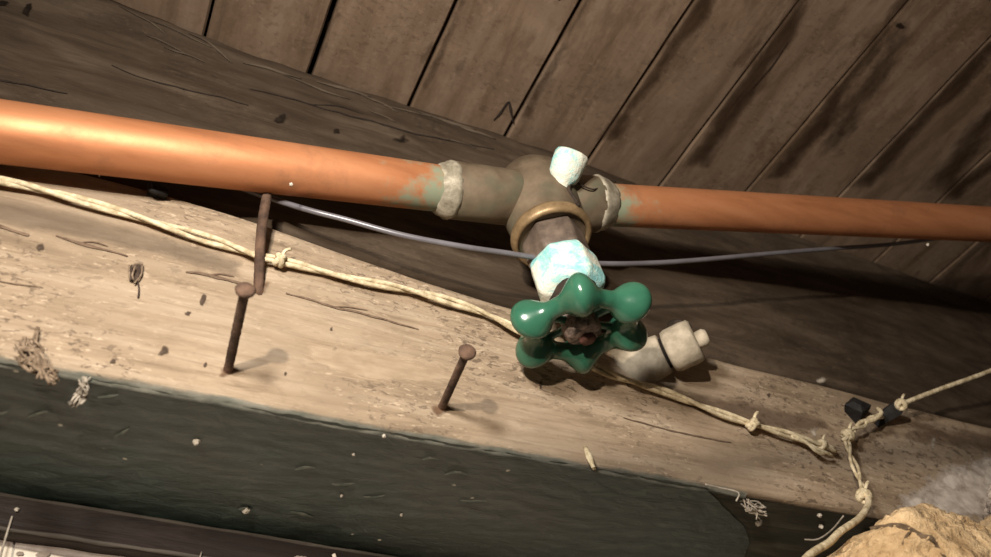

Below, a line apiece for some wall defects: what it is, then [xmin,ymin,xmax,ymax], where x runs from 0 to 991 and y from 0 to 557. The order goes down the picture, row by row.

water stain [607,0,709,136]
water stain [690,0,803,163]
water stain [770,25,895,176]
water stain [860,43,991,183]
water stain [937,111,991,197]